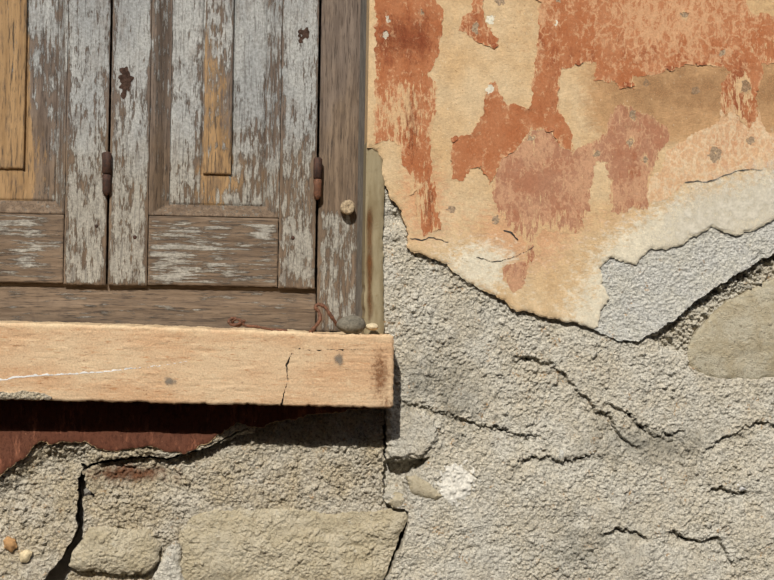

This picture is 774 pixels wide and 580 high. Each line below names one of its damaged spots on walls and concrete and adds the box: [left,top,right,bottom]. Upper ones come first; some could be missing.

spalling [368,0,774,580]
crack [280,348,358,405]
crack [57,428,248,580]
spalling [0,408,408,580]